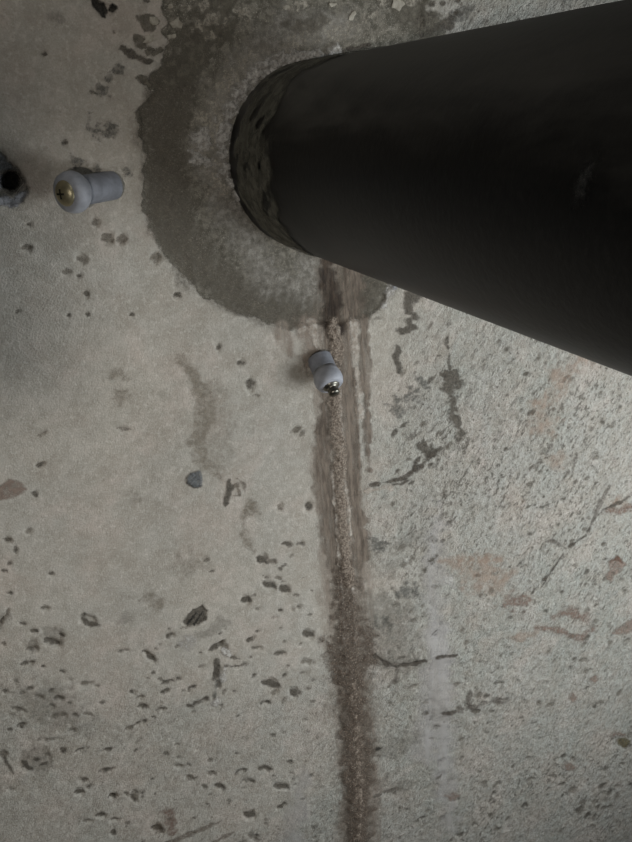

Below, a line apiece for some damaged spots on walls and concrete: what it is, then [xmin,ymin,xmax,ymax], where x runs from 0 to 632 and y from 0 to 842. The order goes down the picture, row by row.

damp [140,67,327,324]
crack [532,485,630,593]
crack [373,653,458,688]